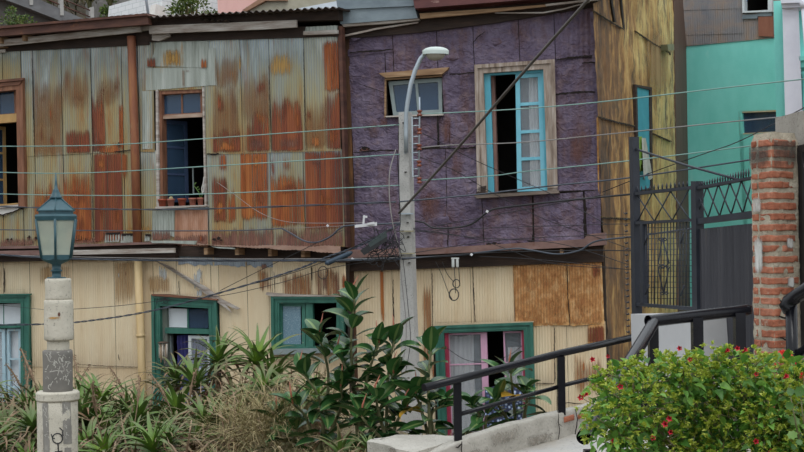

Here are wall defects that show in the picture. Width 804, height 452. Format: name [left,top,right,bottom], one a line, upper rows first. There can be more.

rust [35,41,343,248]